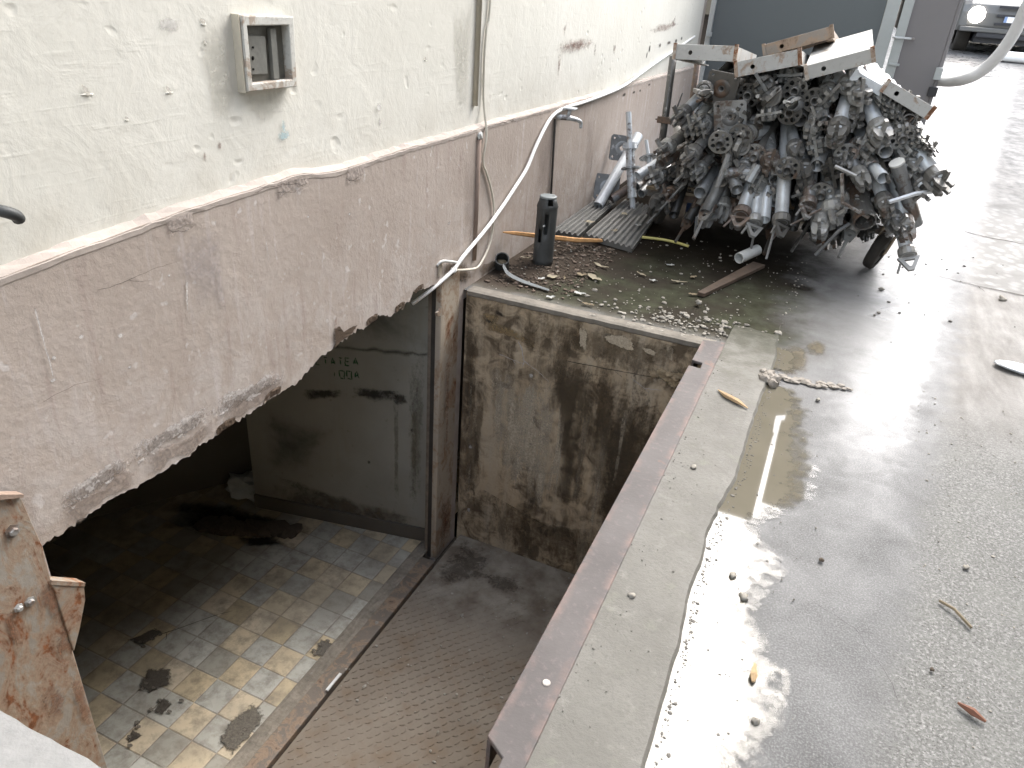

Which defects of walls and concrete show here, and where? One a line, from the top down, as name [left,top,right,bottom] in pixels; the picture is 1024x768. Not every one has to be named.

flaking render [63,374,281,520]
water stain [307,390,338,399]
water stain [358,389,406,404]
water stain [465,342,483,492]
water stain [493,328,671,565]